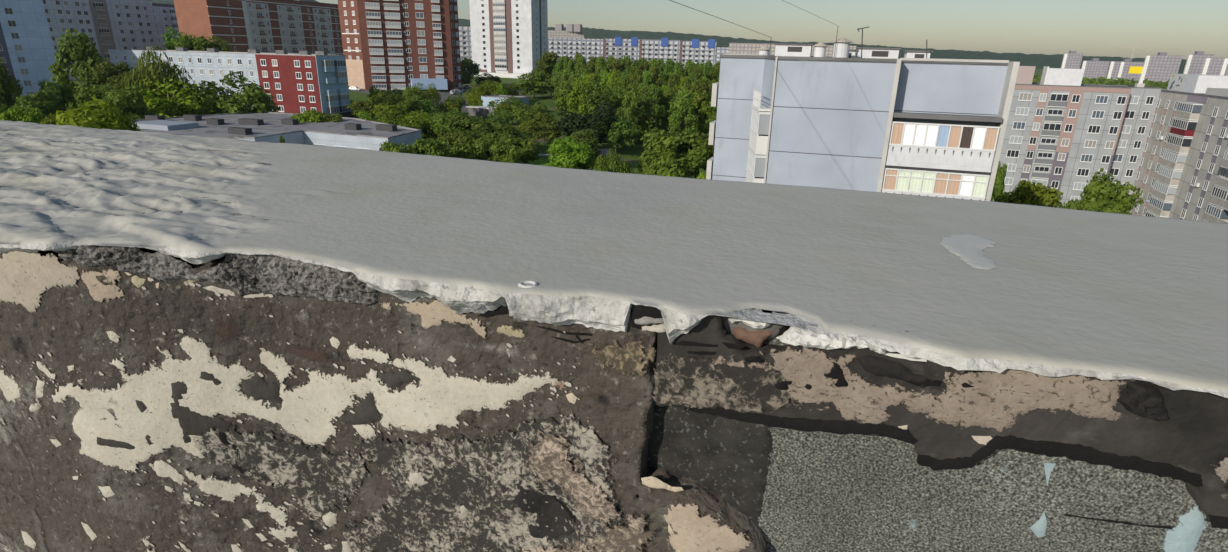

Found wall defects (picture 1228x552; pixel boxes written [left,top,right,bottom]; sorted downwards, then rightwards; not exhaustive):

spalling [0,245,524,357]
peeling [0,322,751,552]
peeling [592,305,1139,445]
peeling [1215,457,1228,483]